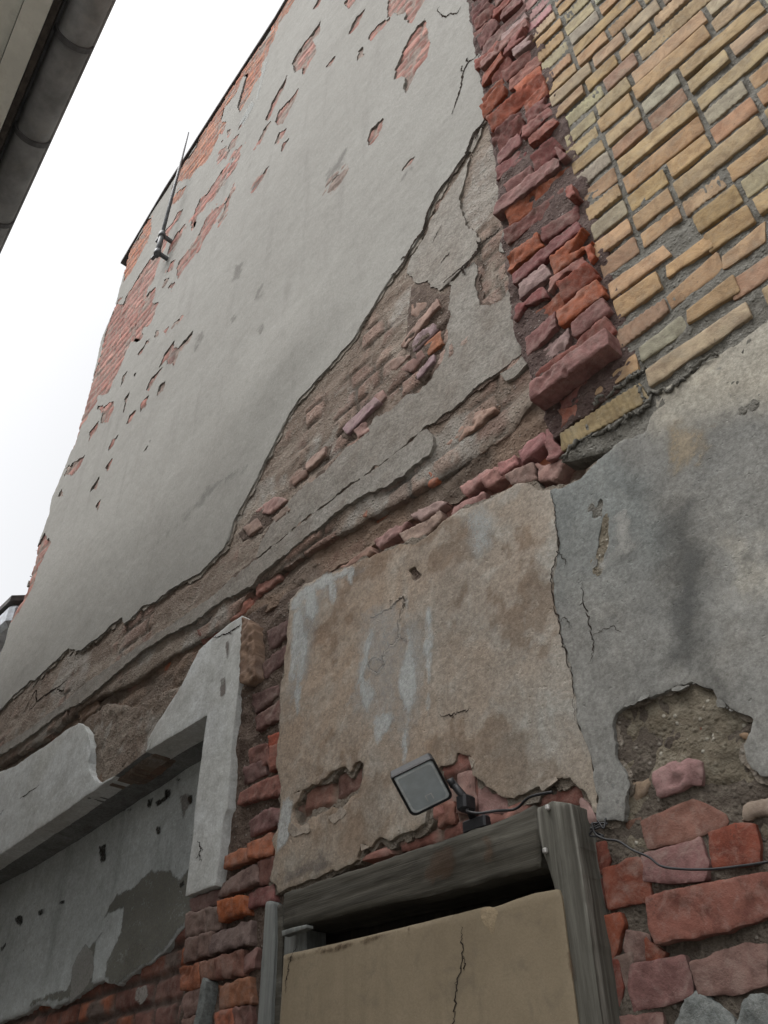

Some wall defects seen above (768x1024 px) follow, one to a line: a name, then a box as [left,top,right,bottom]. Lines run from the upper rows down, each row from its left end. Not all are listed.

crack [452,53,479,113]
spalling [0,0,636,711]
flaking render [0,629,220,790]
efflorescence [289,569,354,703]
crack [367,594,407,676]
efflorescence [398,640,432,711]
crack [550,491,621,720]
efflorescence [277,801,292,851]
flaking render [268,683,768,1024]
peeling [70,944,94,1002]
peeling [135,985,148,1004]
crack [452,927,466,1024]